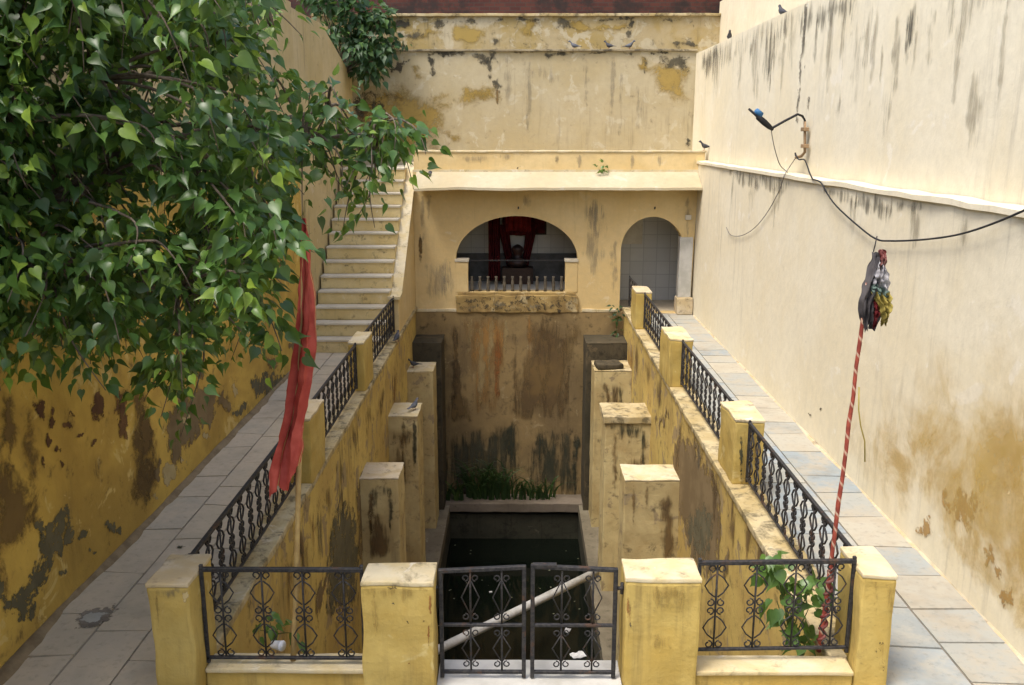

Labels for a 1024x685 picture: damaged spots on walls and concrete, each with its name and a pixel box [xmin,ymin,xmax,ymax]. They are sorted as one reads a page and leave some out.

crack [796,4,810,122]
damp [829,191,915,214]
flaking render [33,400,97,468]
flaking render [91,391,128,440]
damp [448,318,577,477]
damp [530,432,580,495]
damp [368,489,394,557]
damp [662,497,673,558]
peeling [915,515,930,537]
peeling [0,504,97,622]
peeling [983,544,1013,607]